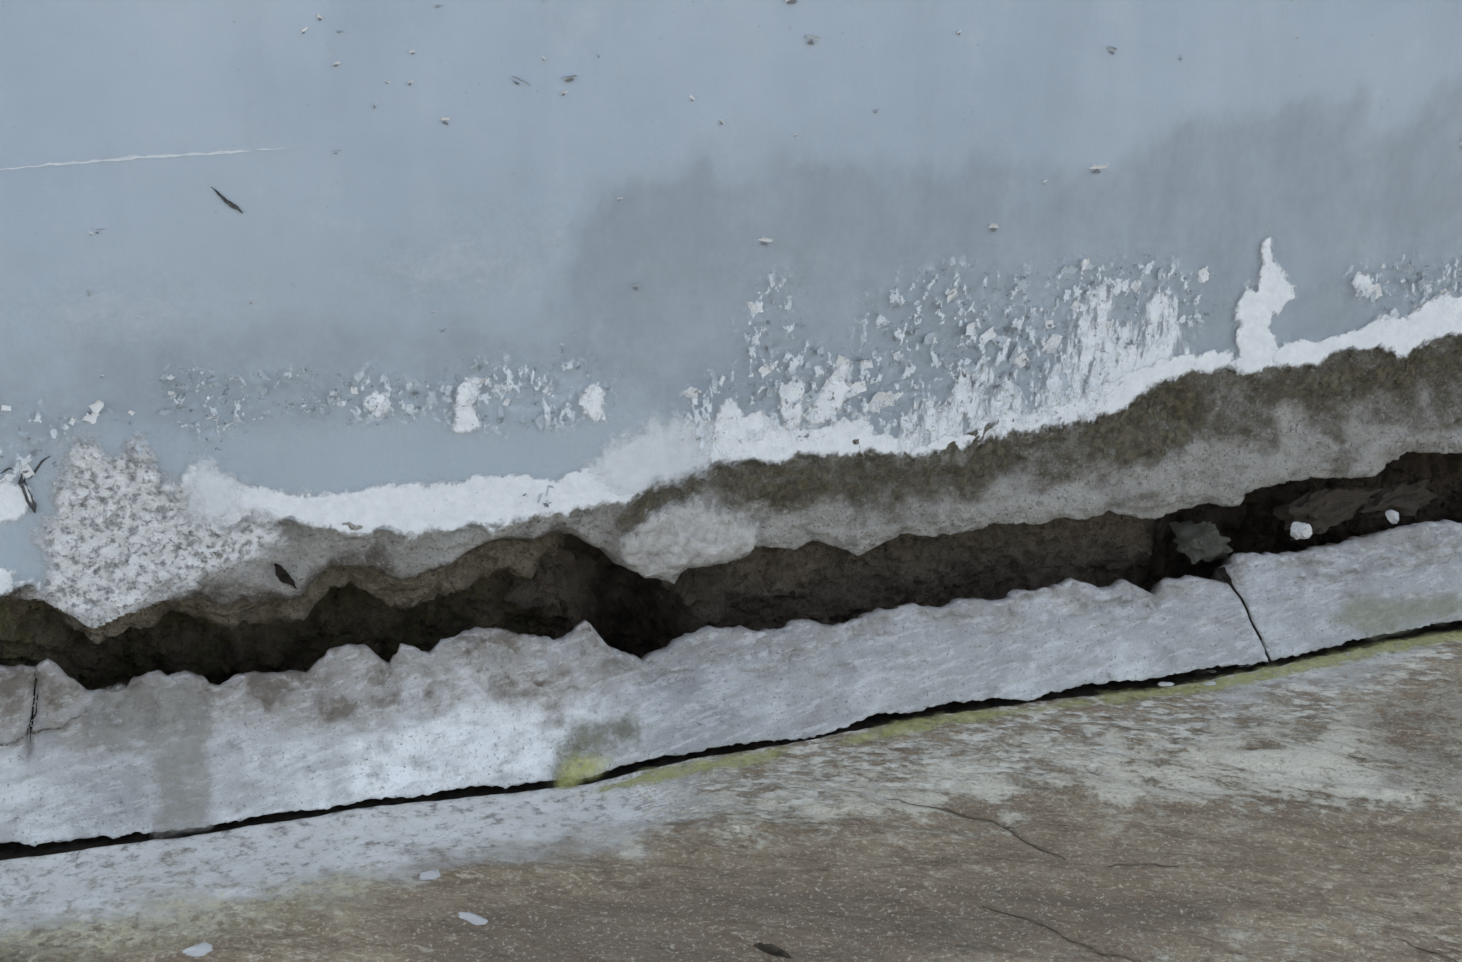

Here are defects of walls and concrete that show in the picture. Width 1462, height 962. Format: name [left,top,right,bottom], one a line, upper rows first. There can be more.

spalling [0,238,1462,629]
crack [0,452,1462,861]